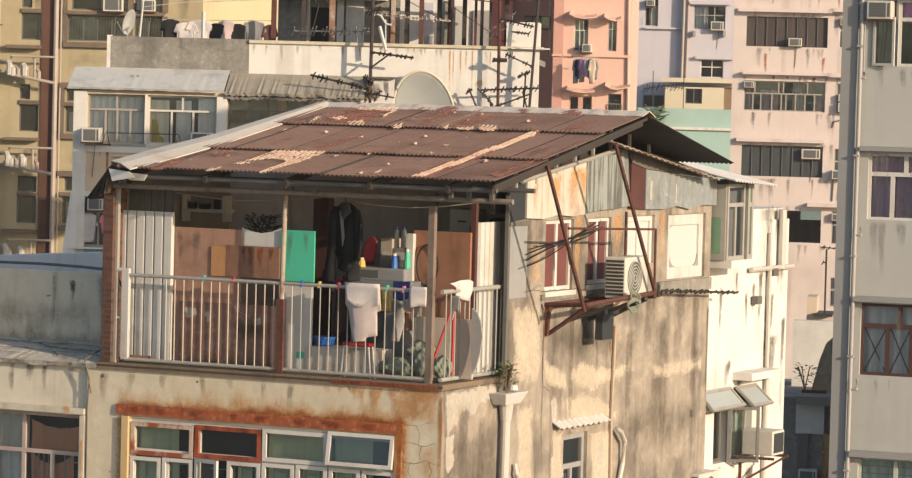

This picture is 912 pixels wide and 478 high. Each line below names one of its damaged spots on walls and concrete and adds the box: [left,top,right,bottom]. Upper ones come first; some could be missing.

rust [572,170,587,192]
rust [118,379,442,478]
crack [402,422,439,478]